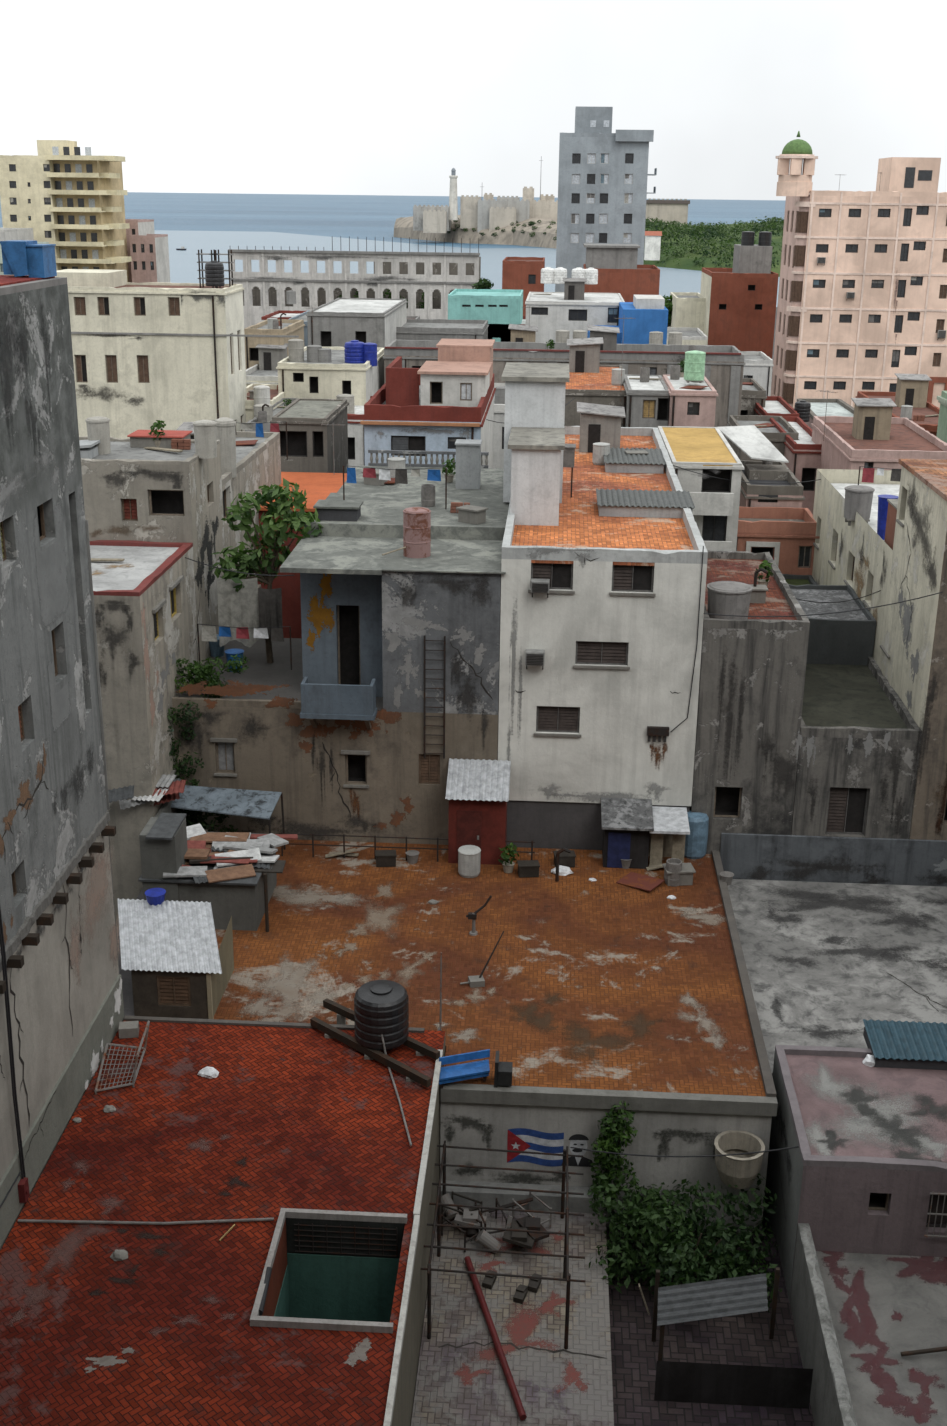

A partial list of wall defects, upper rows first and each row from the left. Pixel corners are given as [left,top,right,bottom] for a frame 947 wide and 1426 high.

leakage [0,307,58,485]
peeling [306,574,335,652]
flaking render [157,617,487,753]
flaking render [0,744,47,858]